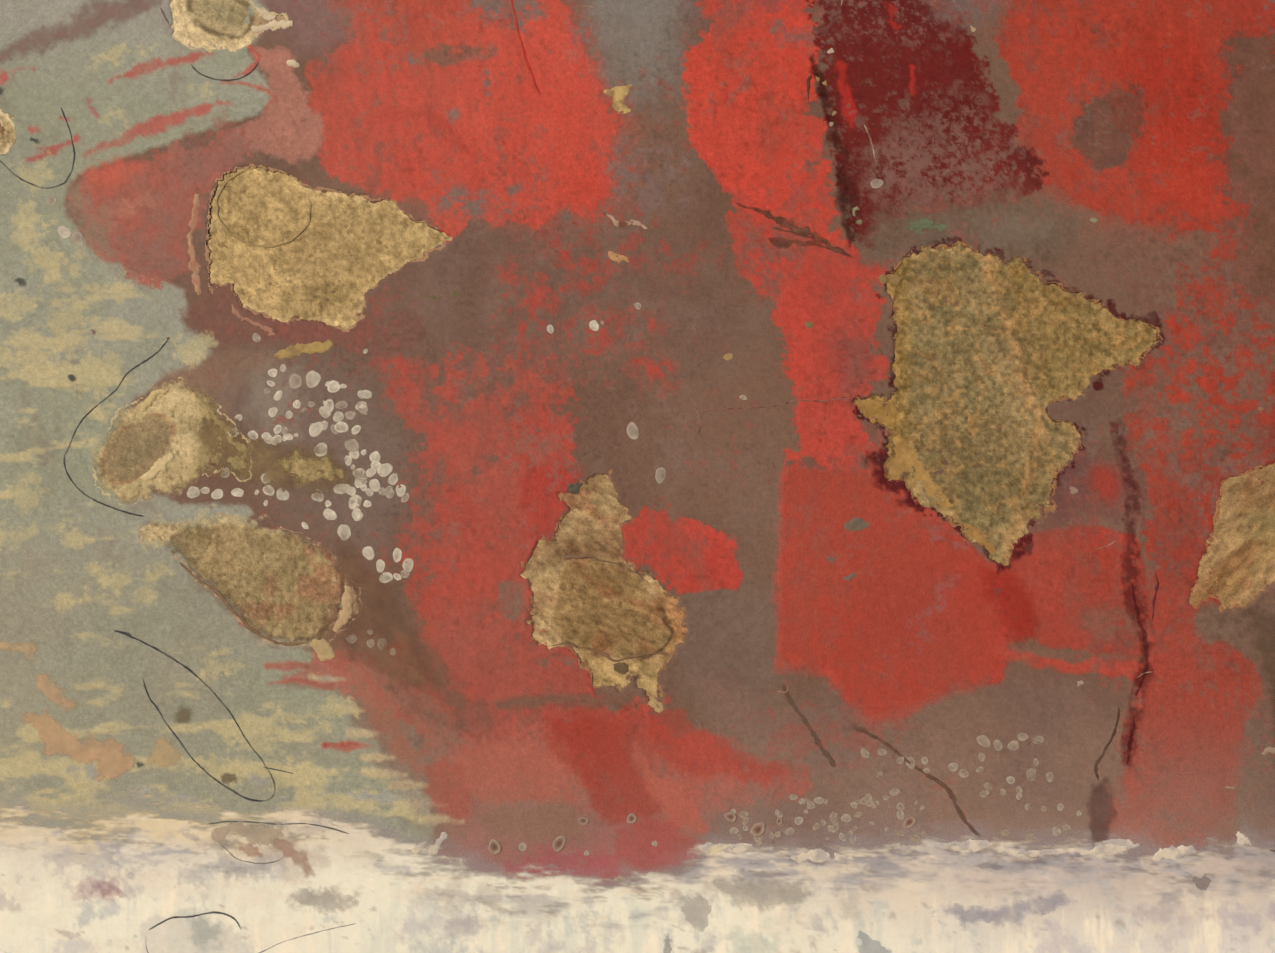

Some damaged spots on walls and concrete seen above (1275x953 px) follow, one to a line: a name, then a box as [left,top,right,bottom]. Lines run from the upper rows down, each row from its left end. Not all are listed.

spalling [170,0,293,53]
spalling [187,163,453,359]
spalling [92,377,253,507]
spalling [139,512,362,661]
spalling [278,450,345,482]
spalling [520,469,688,713]
peeling [844,518,869,531]
spalling [854,241,1163,566]
spalling [1189,463,1275,612]
crack [783,687,835,766]
crack [859,729,978,834]
crack [1095,571,1159,779]